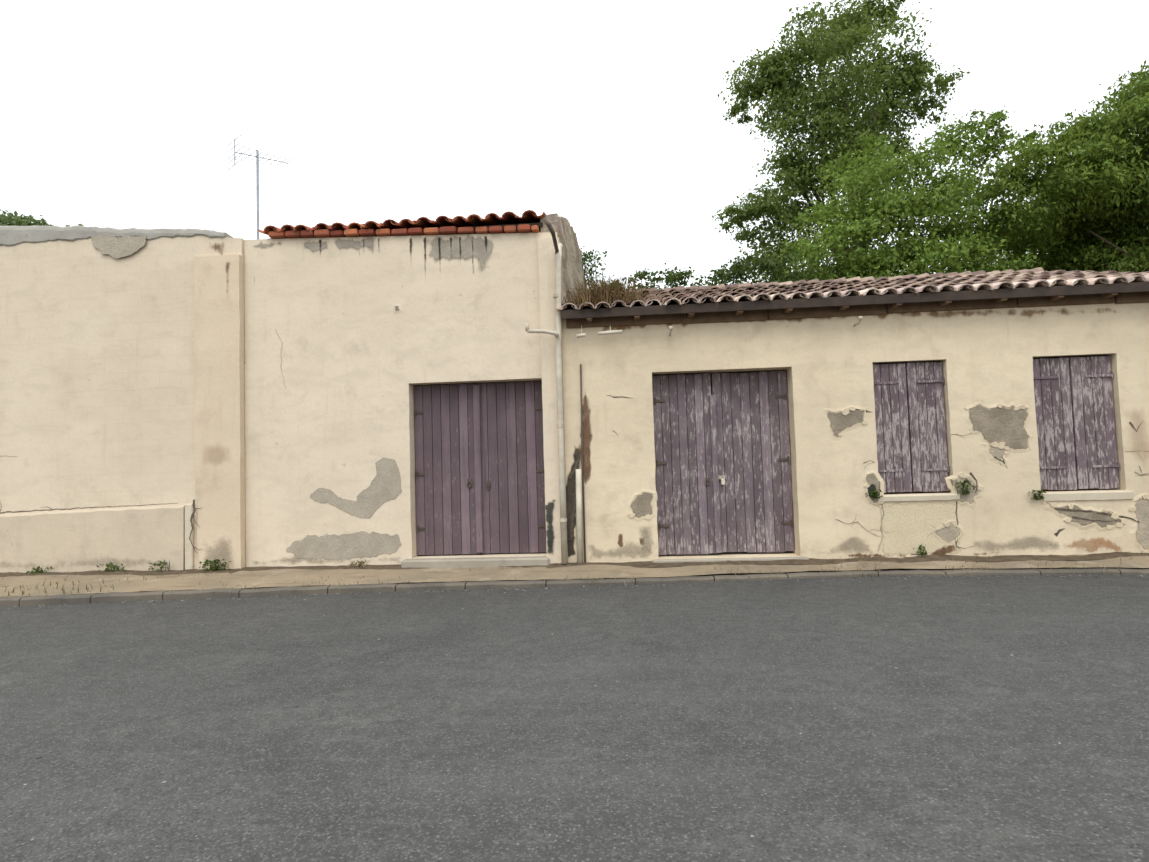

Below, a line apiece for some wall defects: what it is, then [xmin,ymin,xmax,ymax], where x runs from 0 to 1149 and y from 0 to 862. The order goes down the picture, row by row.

leakage [410,236,493,272]
spalling [823,405,868,441]
spalling [965,401,1033,466]
spalling [627,489,658,522]
spalling [1040,493,1149,553]